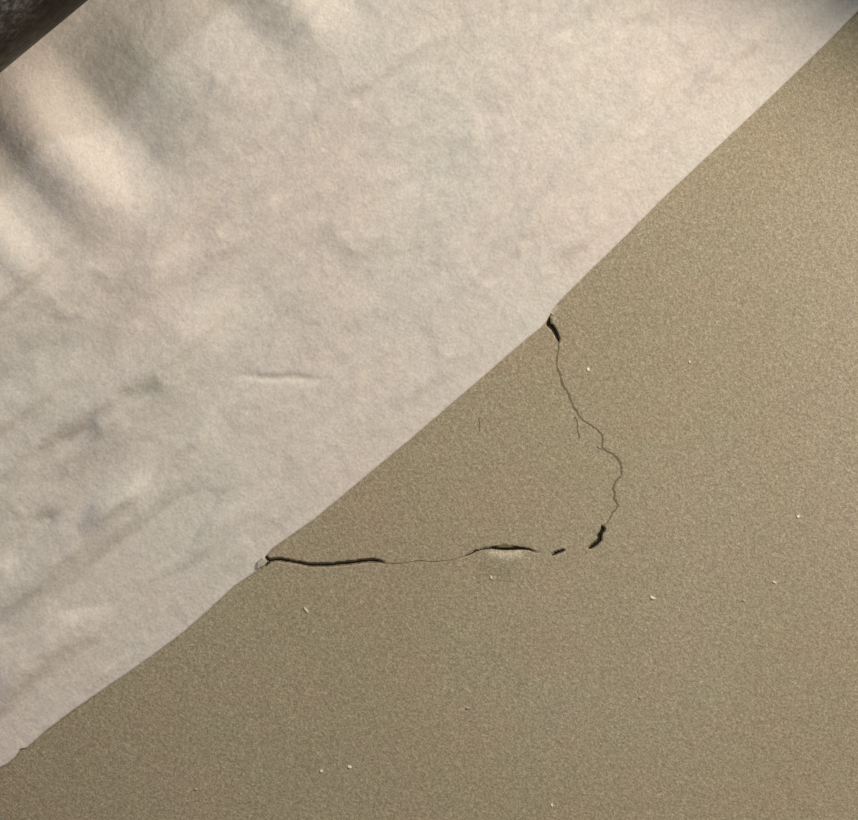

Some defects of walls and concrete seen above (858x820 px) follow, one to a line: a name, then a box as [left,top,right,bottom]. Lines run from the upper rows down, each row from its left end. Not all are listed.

crack [548,306,623,548]
crack [256,543,565,584]